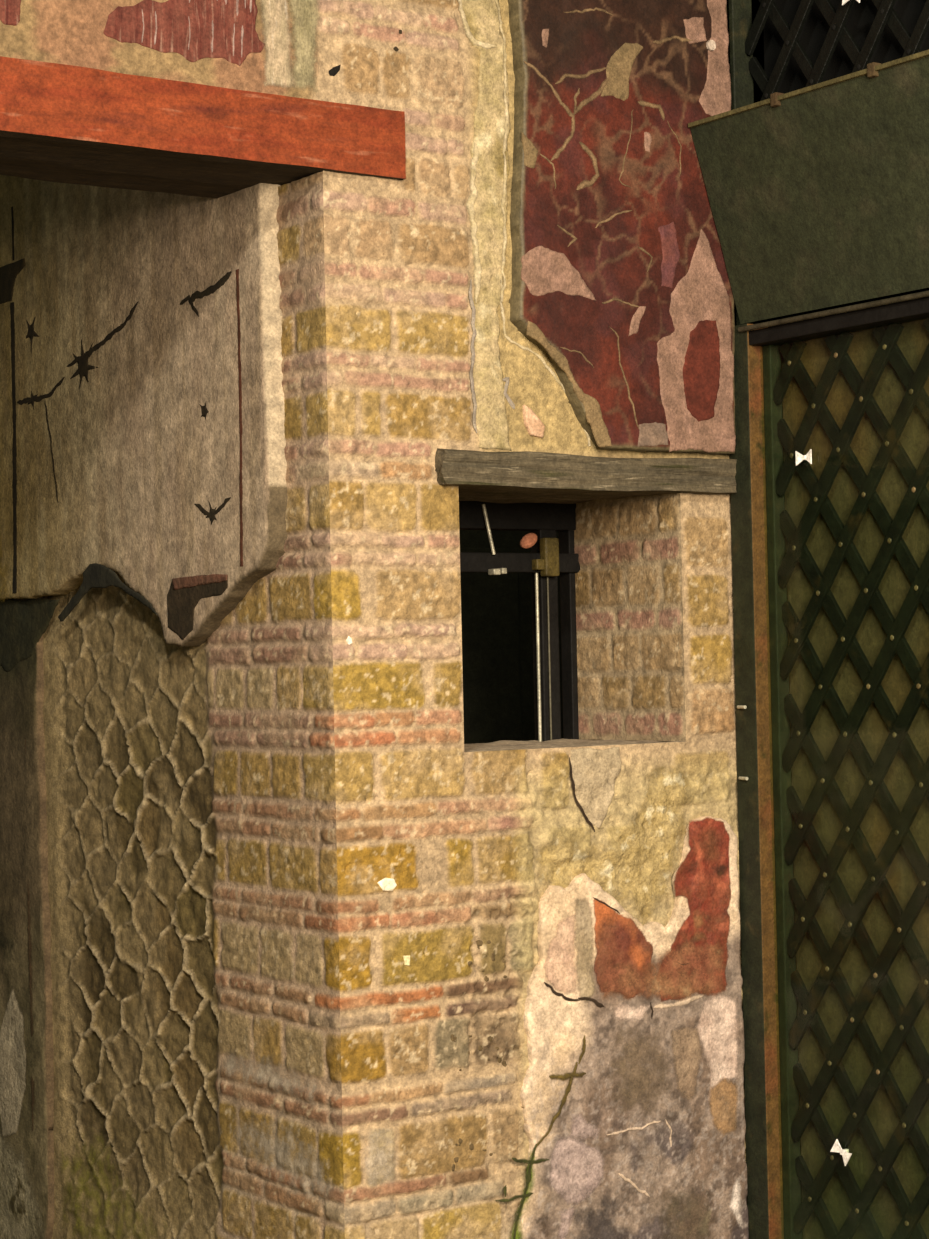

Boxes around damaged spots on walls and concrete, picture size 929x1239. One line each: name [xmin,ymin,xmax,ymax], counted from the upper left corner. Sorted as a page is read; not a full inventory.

crack [524,61,682,246]
peeling [508,0,736,455]
crack [180,271,232,317]
crack [17,302,138,501]
crack [560,298,639,429]
crack [194,497,231,518]
spalling [58,563,228,640]
crack [569,757,595,832]
crack [544,982,605,1008]
peeling [511,767,749,1239]
crack [495,1036,586,1239]
damp [663,1191,712,1239]